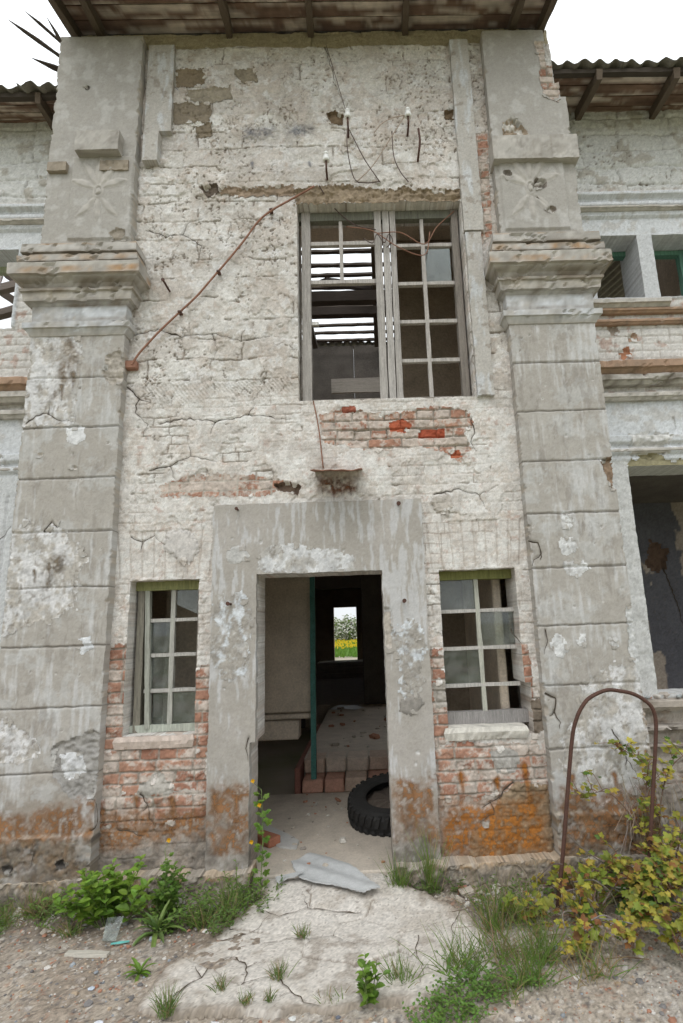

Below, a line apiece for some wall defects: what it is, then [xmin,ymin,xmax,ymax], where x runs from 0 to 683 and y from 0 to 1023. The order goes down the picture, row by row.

peeling [173,66,258,138]
spalling [534,41,561,102]
crack [127,387,289,436]
spalling [319,406,474,462]
corrosion [320,478,356,494]
flaking render [559,510,591,578]
spalling [645,539,669,573]
spalling [0,590,256,828]
crack [220,896,424,1006]